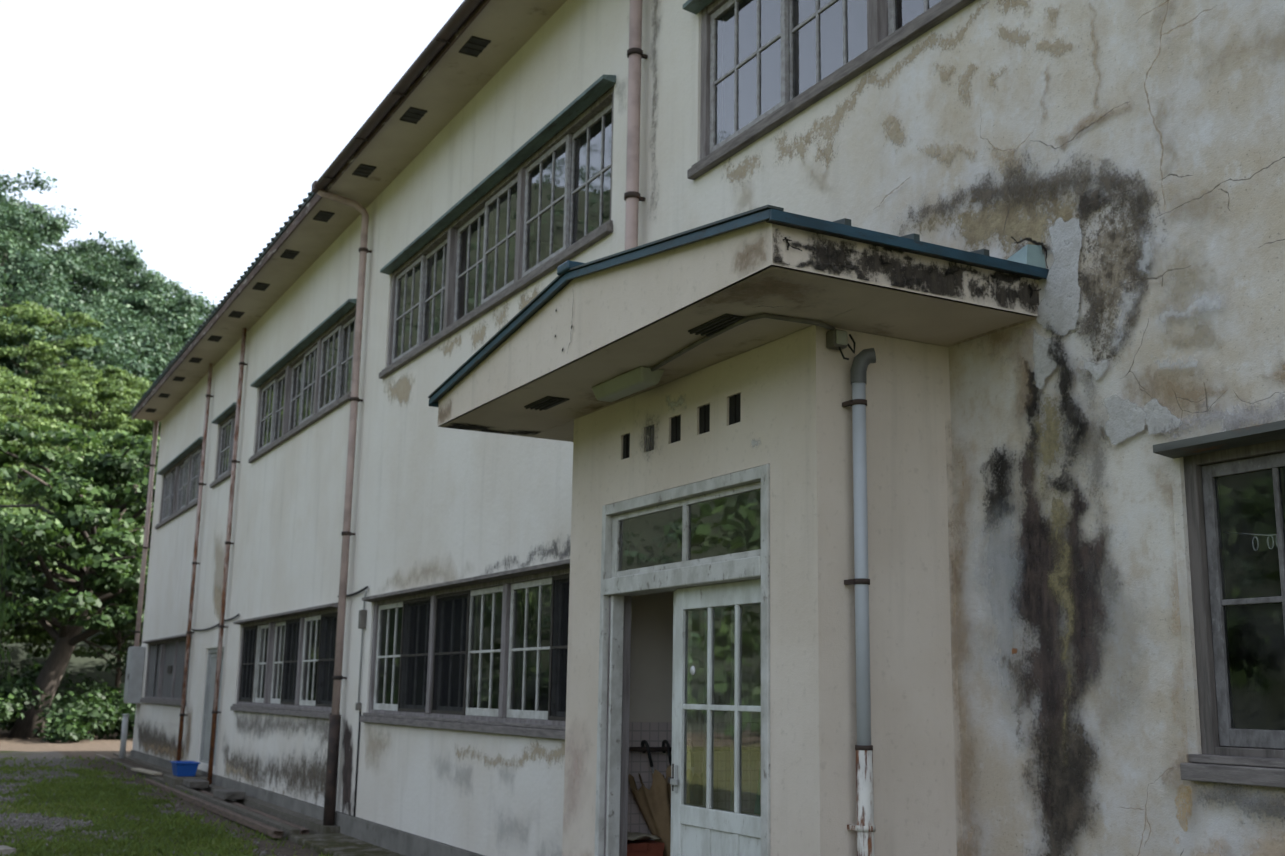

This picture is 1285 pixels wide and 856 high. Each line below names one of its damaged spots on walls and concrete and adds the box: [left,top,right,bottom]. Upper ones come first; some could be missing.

leakage [775,0,1097,166]
crack [980,0,1285,298]
leakage [727,148,1153,356]
flaking render [919,183,1159,389]
crack [1120,318,1279,423]
leakage [485,540,571,574]
leakage [955,272,1117,856]
leakage [138,722,184,760]
leakage [223,712,353,816]
leakage [455,741,565,767]
crack [1118,767,1174,856]